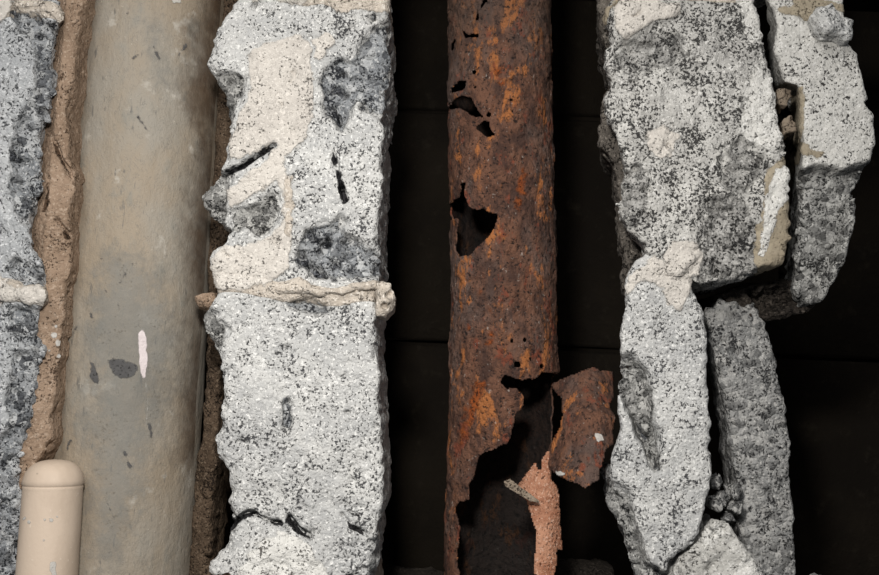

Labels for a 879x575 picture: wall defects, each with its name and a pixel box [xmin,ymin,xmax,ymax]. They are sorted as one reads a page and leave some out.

crack [222,146,274,177]
crack [331,152,348,204]
crack [760,26,794,279]
spalling [204,311,225,350]